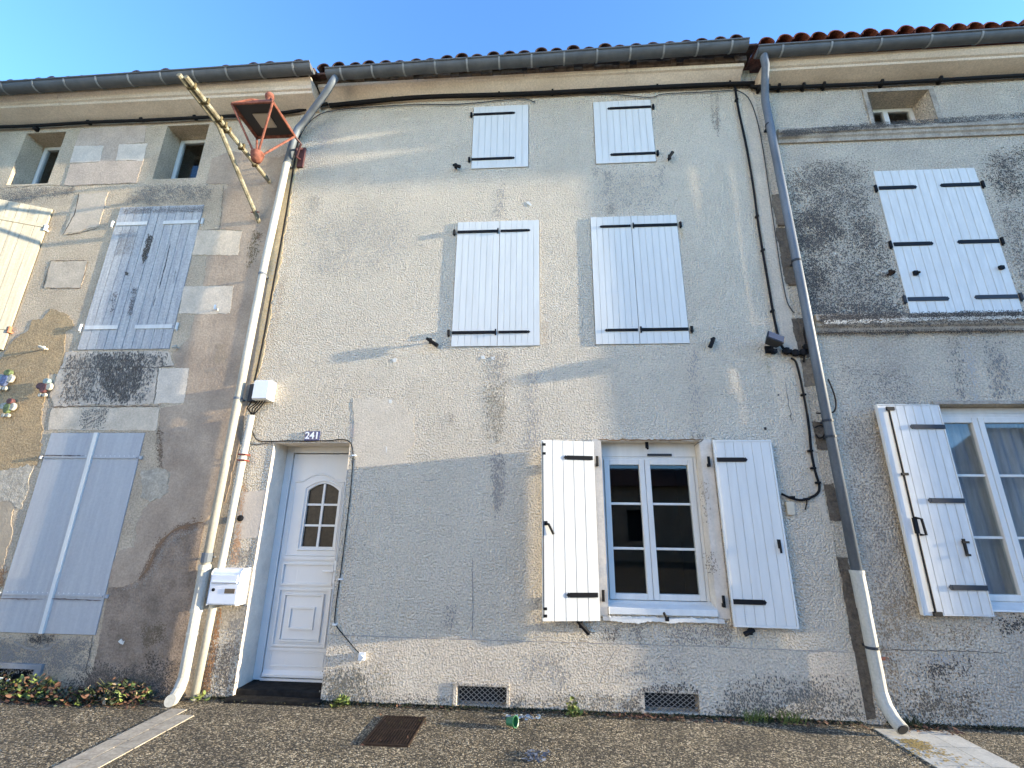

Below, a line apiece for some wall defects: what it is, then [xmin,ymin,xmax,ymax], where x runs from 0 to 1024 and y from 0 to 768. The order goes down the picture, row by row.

water stain [59,350,169,430]
water stain [776,143,1024,401]